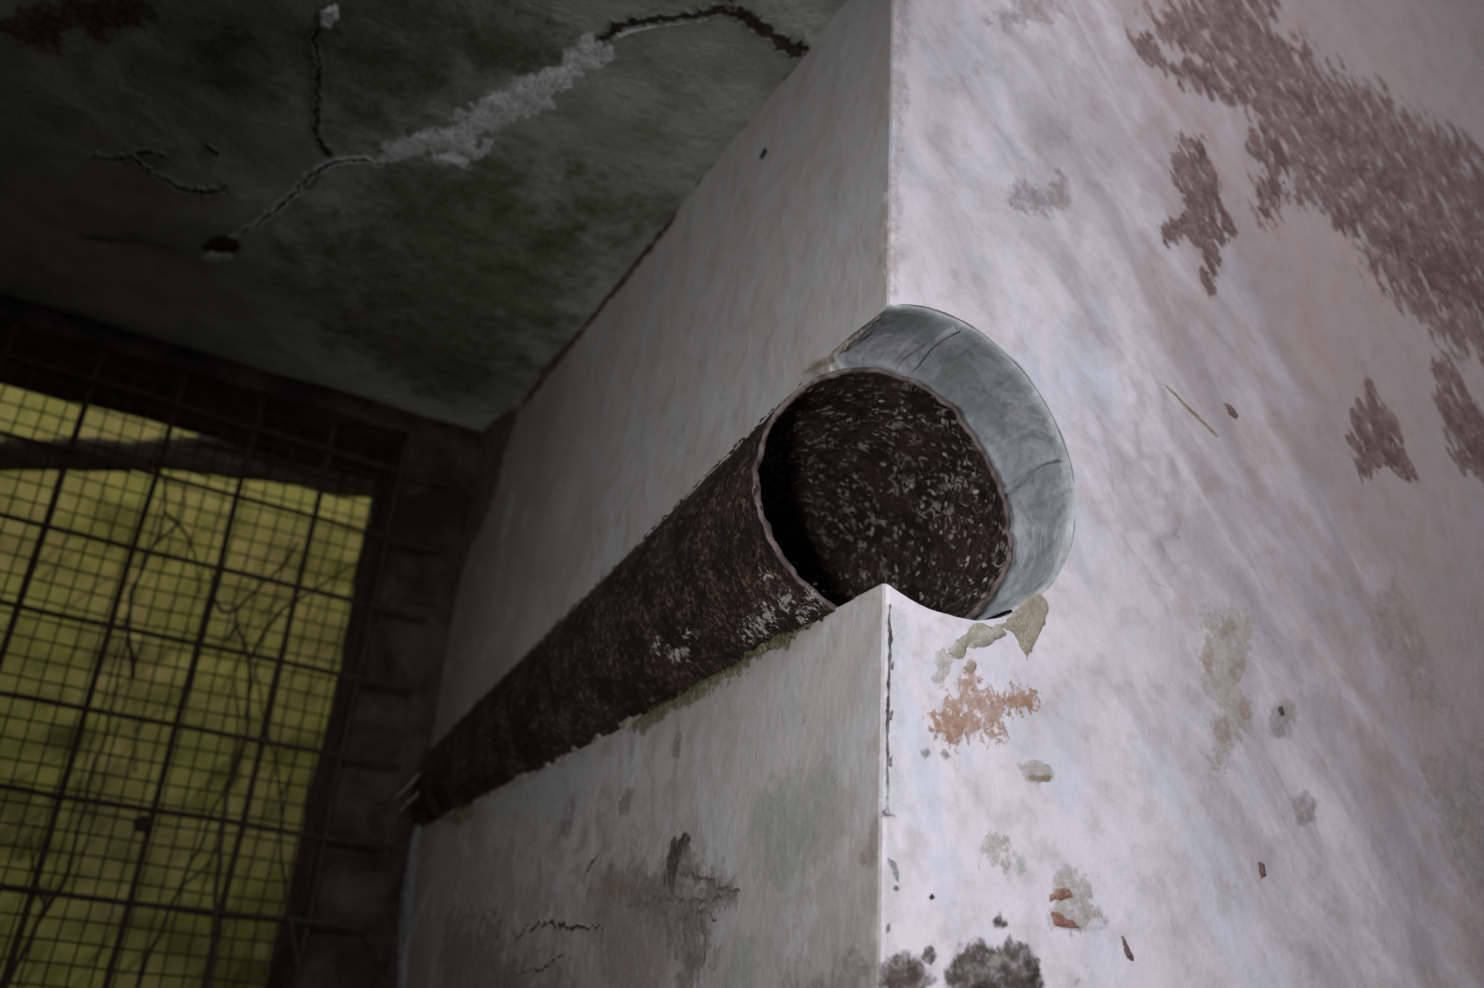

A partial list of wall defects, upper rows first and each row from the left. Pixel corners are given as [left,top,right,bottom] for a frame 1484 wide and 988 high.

leakage [298,0,563,123]
crack [228,0,810,240]
crack [522,164,714,407]
spalling [932,593,1049,682]
leakage [627,832,741,987]
leakage [878,946,936,988]